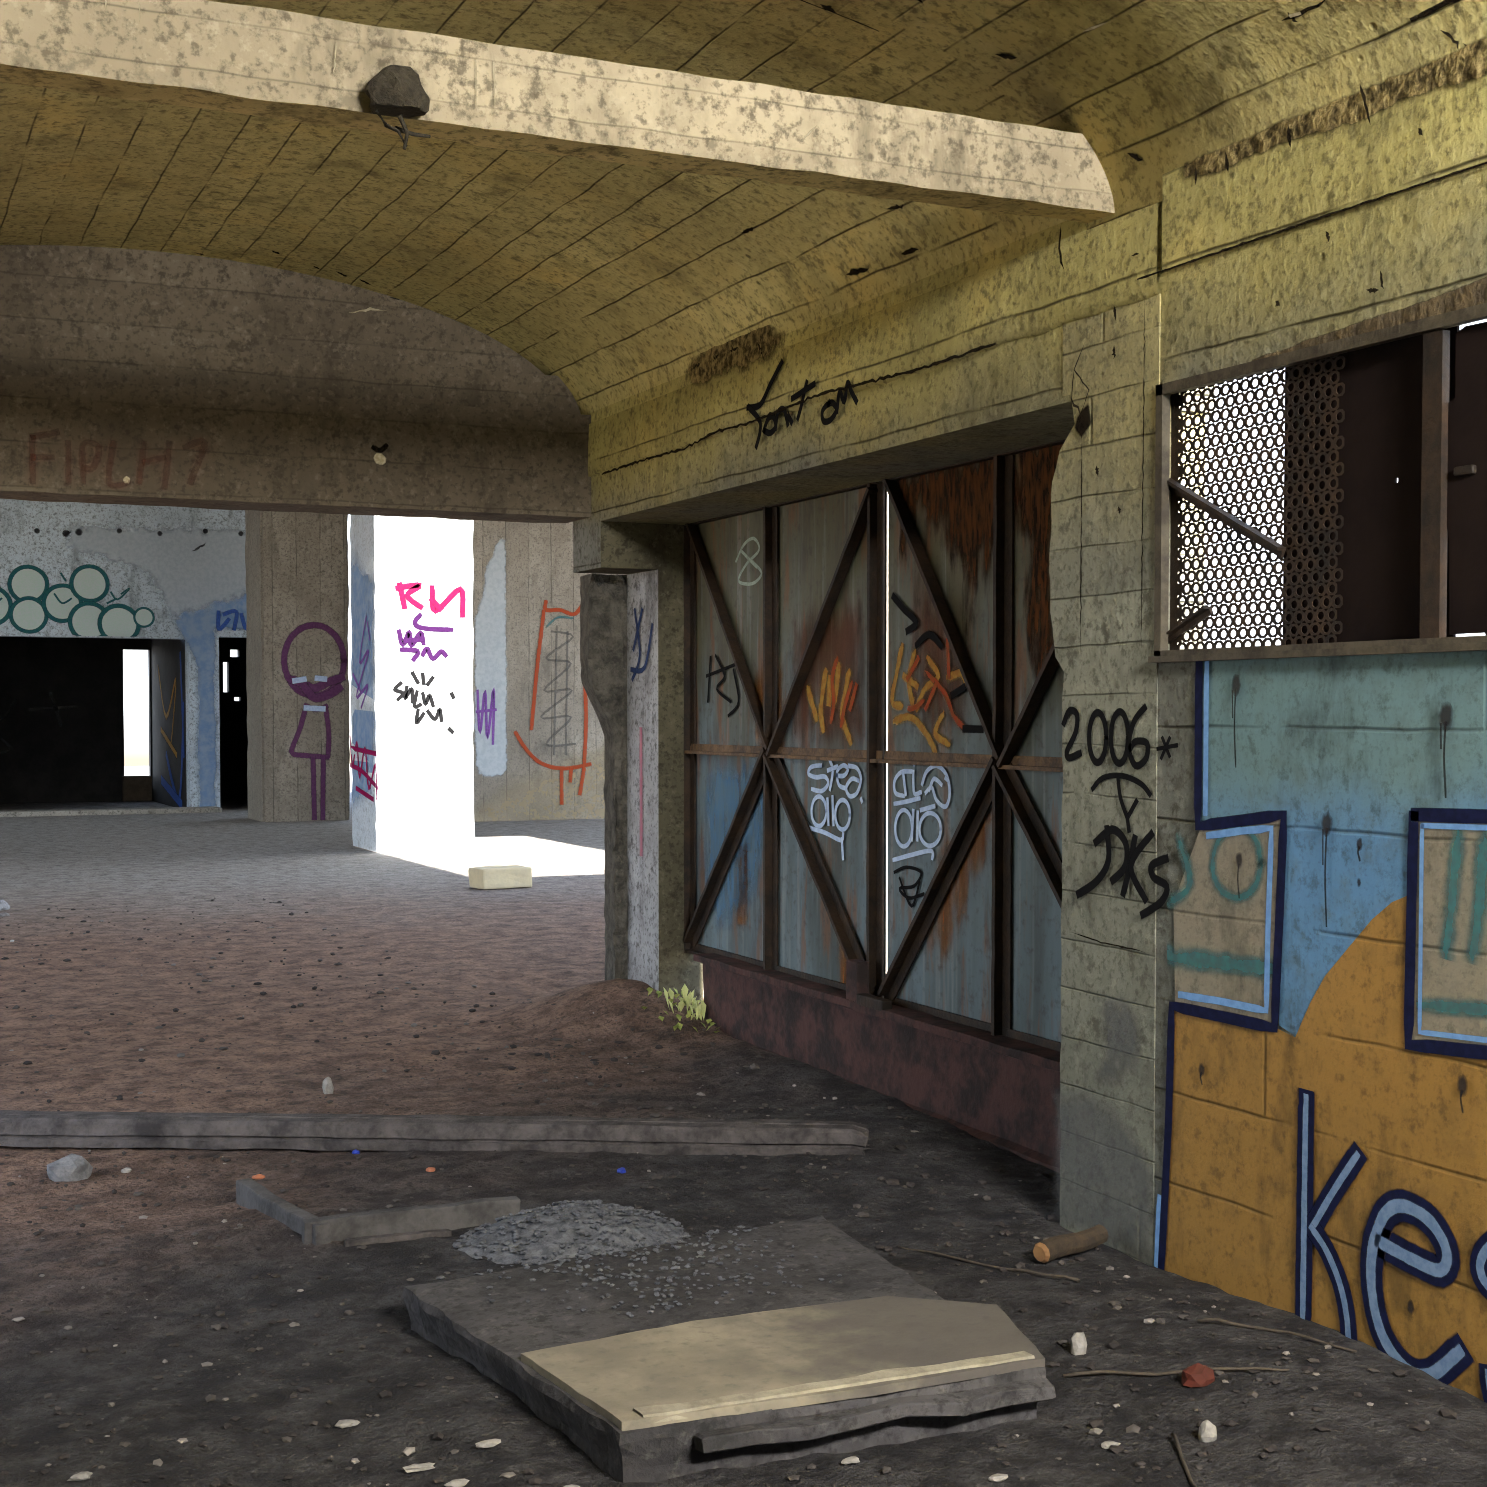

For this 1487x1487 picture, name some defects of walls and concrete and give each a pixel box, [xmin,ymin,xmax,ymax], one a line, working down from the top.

spalling [1282,0,1325,22]
crack [1409,0,1466,48]
spalling [1184,37,1487,178]
spalling [688,325,781,385]
rust [898,459,994,603]
rust [1014,444,1063,678]
rust [754,613,860,739]
rust [913,598,959,716]
rust [724,843,748,924]
rust [939,813,990,953]